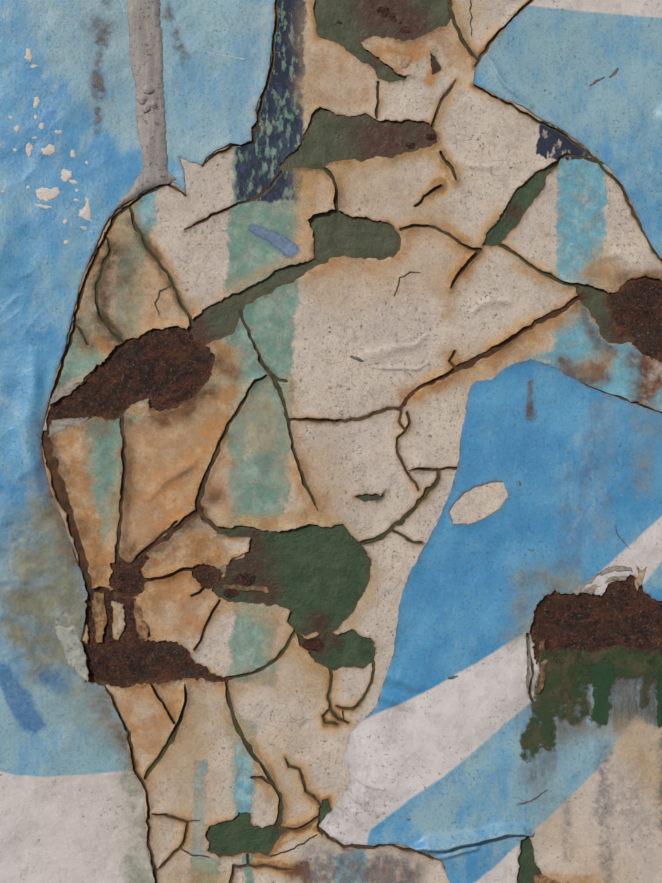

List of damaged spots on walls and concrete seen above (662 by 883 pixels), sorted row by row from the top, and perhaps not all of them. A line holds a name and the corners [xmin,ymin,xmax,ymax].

peeling [313,0,450,82]
peeling [279,107,437,171]
crack [430,0,662,262]
peeling [187,210,401,344]
crack [115,151,587,650]
corrosion [301,216,480,292]
corrosion [584,253,662,404]
corrosion [41,263,337,758]
peeling [212,524,375,671]
corrosion [515,565,662,693]
crack [100,681,210,883]
crack [225,625,445,883]